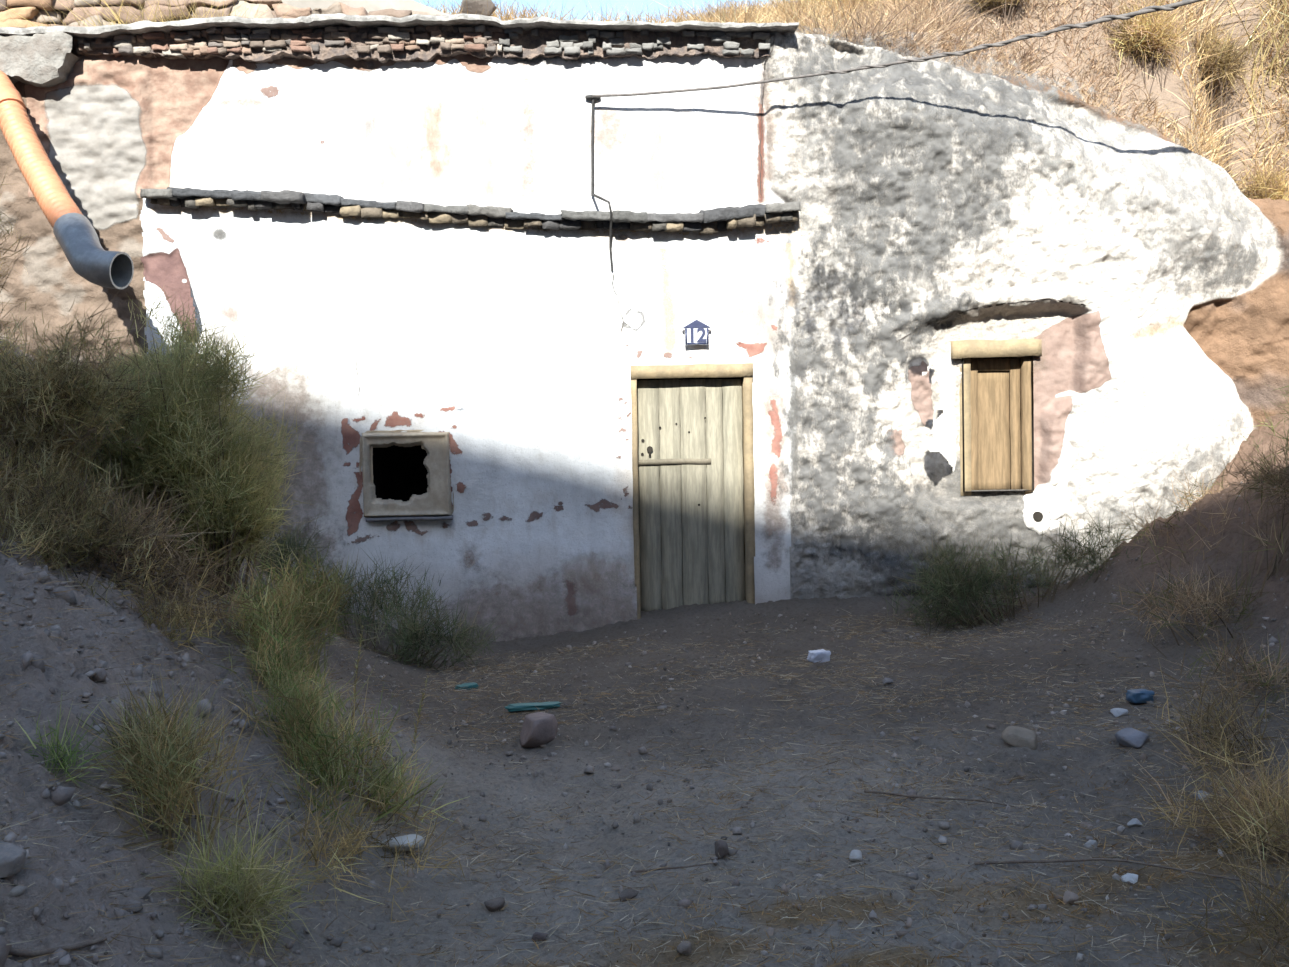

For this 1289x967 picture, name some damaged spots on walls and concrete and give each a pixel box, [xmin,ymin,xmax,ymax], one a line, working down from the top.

flaking render [141,227,197,335]
peeling [737,325,777,357]
water stain [773,28,1269,573]
peeling [280,411,449,569]
peeling [439,406,466,506]
peeling [466,502,564,526]
peeling [586,486,631,512]
peeling [764,396,786,561]
spalling [887,429,905,456]
flaking render [908,357,957,471]
spalling [1033,311,1111,490]